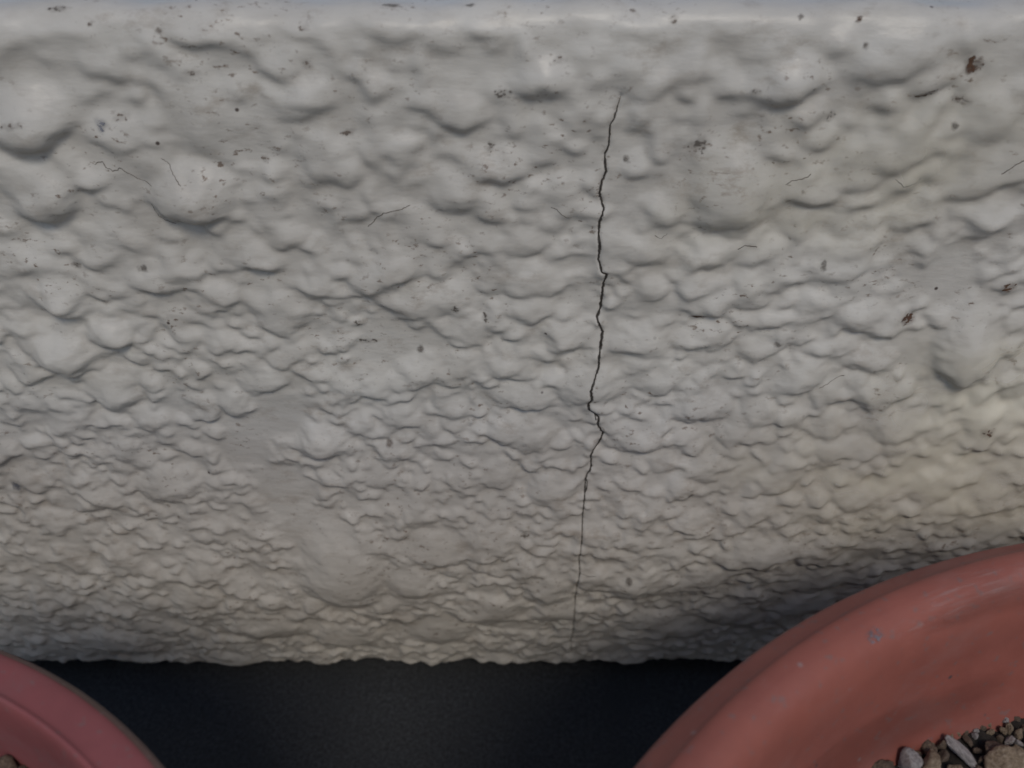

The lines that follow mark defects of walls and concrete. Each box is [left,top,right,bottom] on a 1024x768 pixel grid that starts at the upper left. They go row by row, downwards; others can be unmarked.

crack [570,95,621,652]